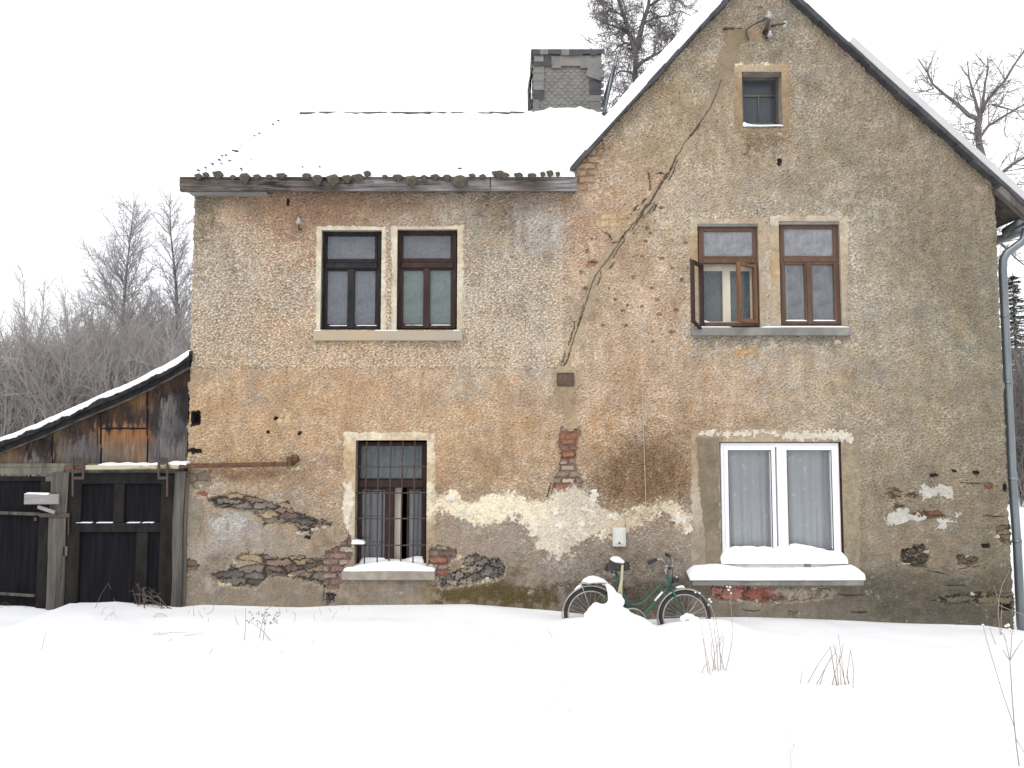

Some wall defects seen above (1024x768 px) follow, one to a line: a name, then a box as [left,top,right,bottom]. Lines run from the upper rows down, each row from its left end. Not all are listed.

crack [558,34,740,366]
peeling [698,428,854,444]
flaking render [186,469,355,606]
peeling [426,423,694,590]
flaking render [709,586,838,617]
flaking render [882,478,964,568]
flaking render [951,554,978,570]
flaking render [990,523,1012,545]